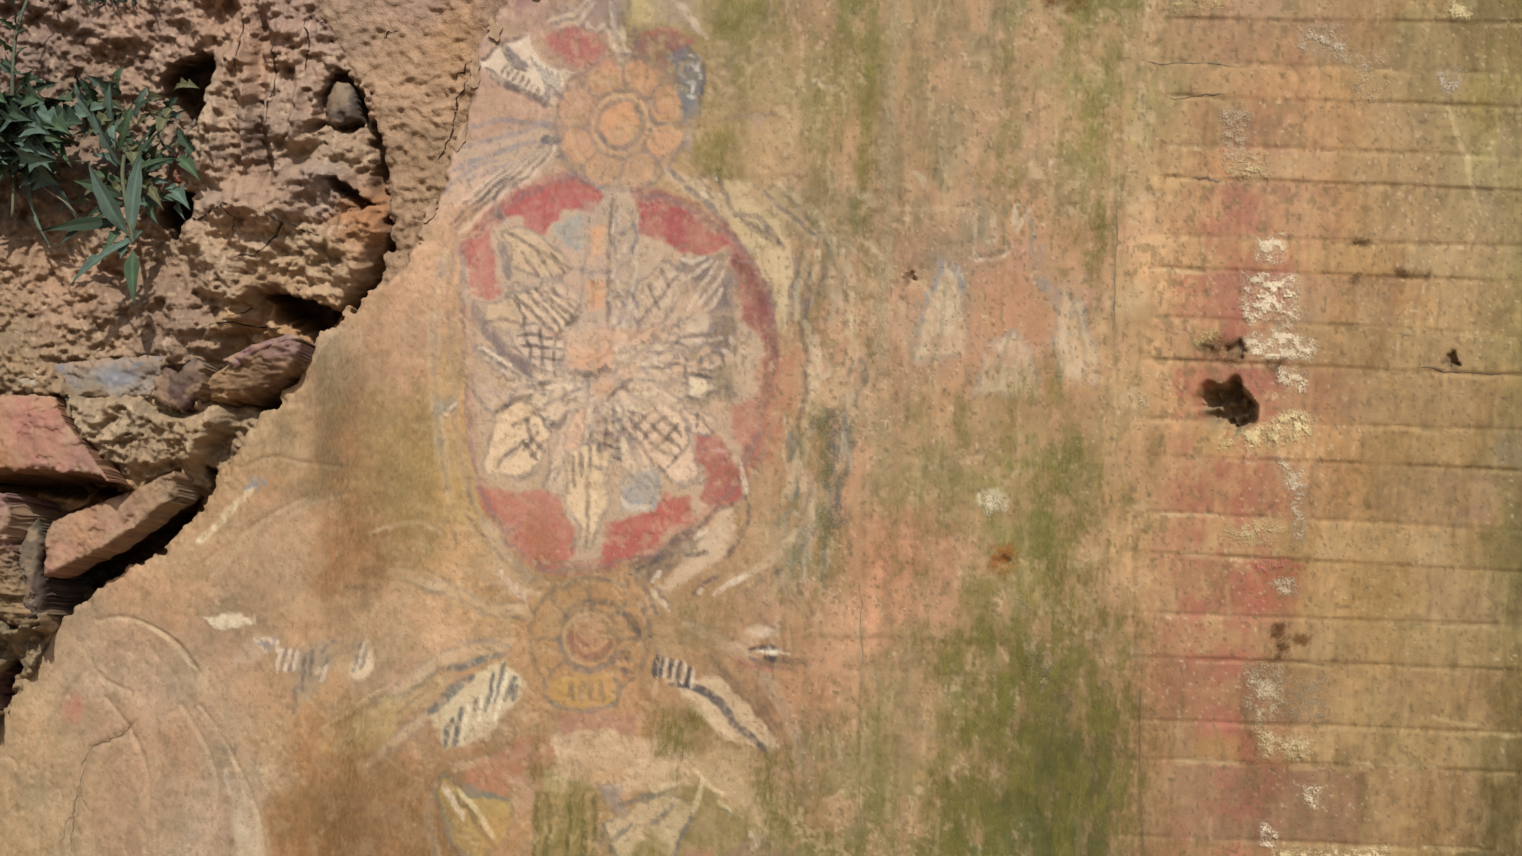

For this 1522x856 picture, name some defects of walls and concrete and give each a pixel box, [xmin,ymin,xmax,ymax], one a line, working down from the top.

water stain [1211,233,1317,595]
water stain [924,520,1131,856]
efflorescence [1243,665,1328,764]
efflorescence [1260,823,1387,856]